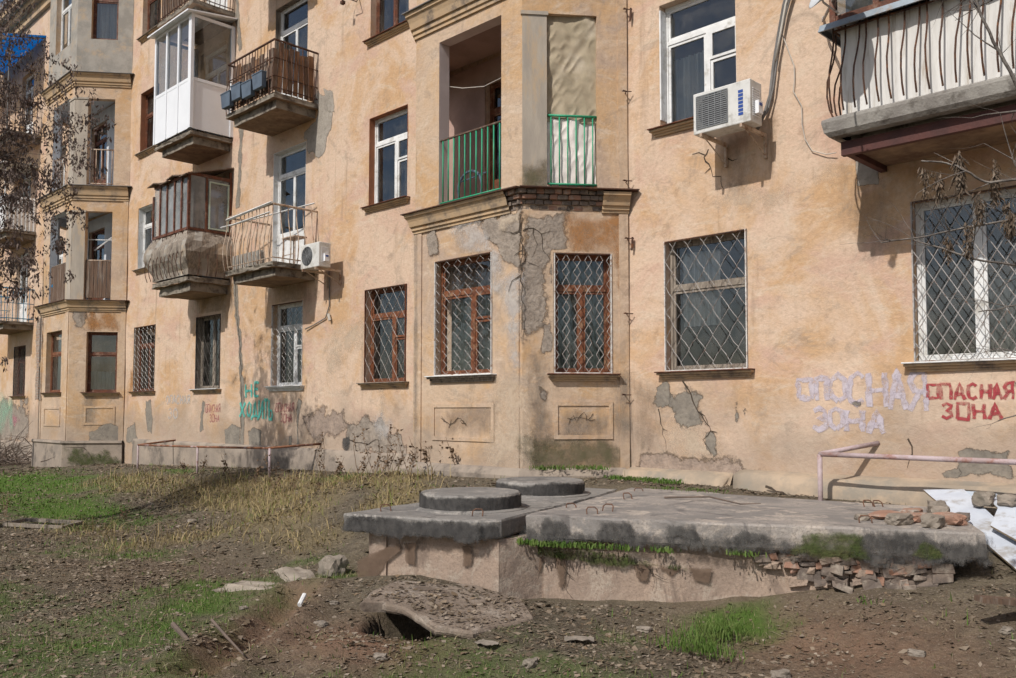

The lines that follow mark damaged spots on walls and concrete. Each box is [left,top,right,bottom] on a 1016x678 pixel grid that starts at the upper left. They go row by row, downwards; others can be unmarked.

flaking render [457,207,571,353]
flaking render [302,406,404,453]
flaking render [639,381,744,479]
crack [682,381,715,453]